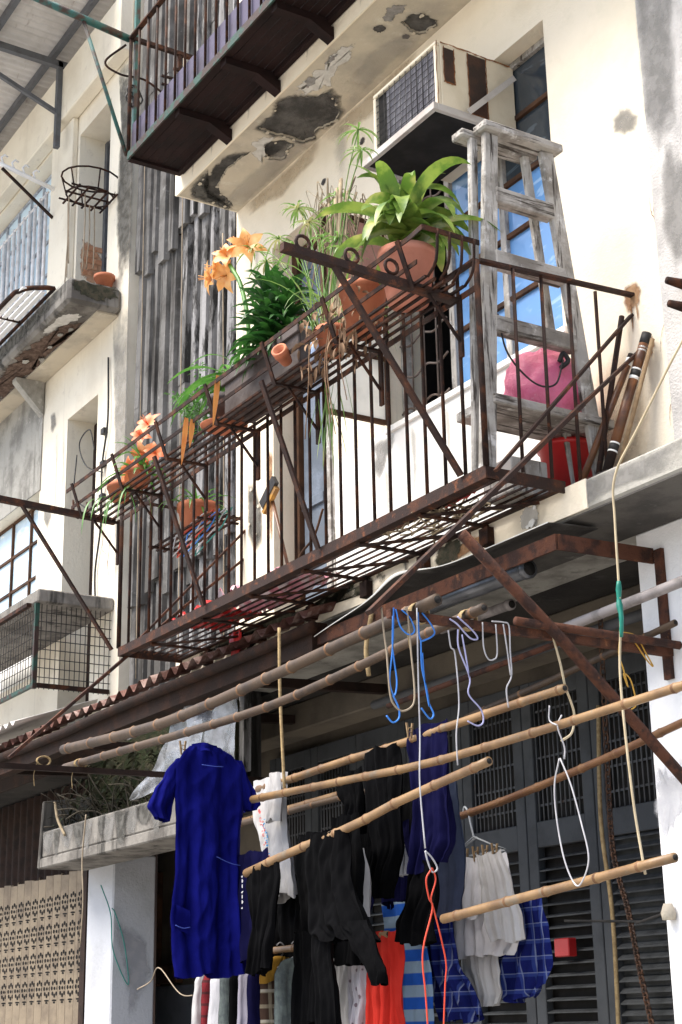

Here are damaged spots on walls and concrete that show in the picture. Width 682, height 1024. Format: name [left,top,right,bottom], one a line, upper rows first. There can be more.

flaking render [373,5,437,39]
flaking render [192,45,354,209]
water stain [615,111,635,132]
rust [624,283,640,329]
spalling [0,322,82,399]